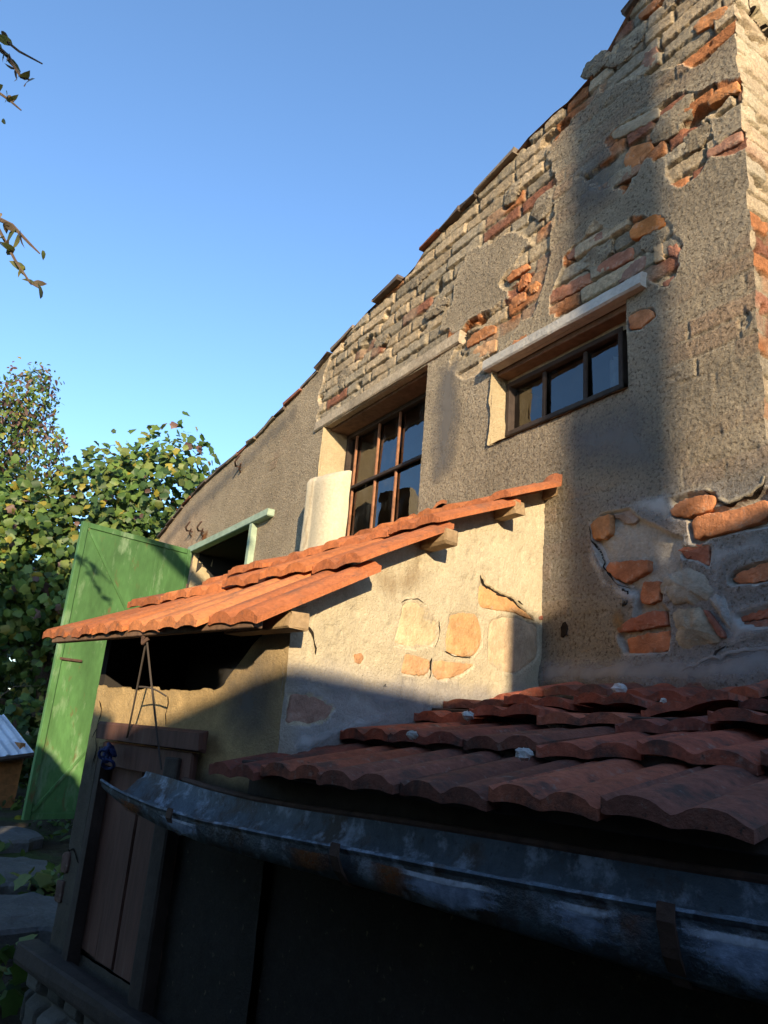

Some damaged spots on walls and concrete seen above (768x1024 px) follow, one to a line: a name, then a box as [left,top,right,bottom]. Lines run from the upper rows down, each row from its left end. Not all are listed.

flaking render [580,50,611,80]
flaking render [650,93,712,157]
flaking render [531,185,556,222]
flaking render [639,229,665,253]
spalling [626,306,657,333]
spalling [589,484,768,656]
crack [480,574,535,621]
flaking render [400,580,543,683]